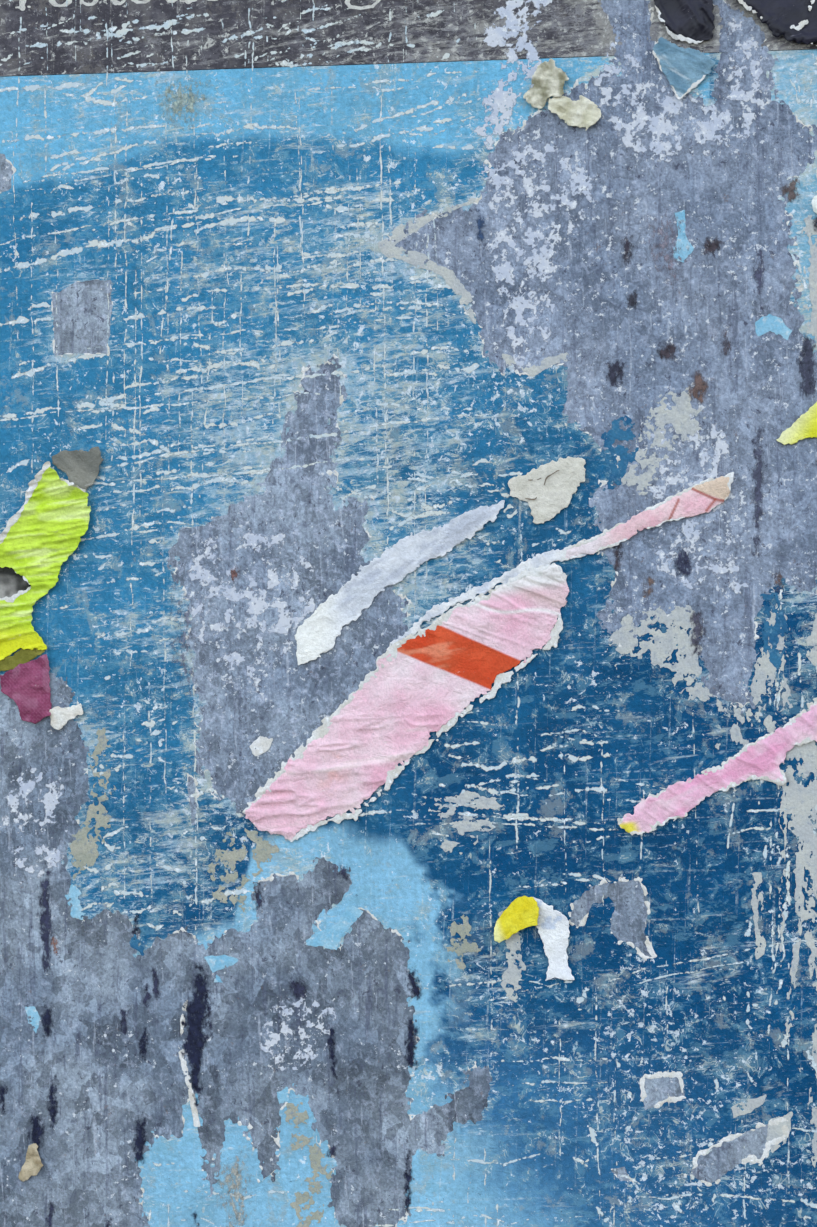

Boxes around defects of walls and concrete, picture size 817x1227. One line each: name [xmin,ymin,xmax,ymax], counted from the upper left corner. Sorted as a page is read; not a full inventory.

peeling [51,279,113,357]
peeling [384,0,817,750]
peeling [0,354,496,1227]
peeling [568,877,657,961]
peeling [639,1071,686,1110]
peeling [684,1117,790,1186]